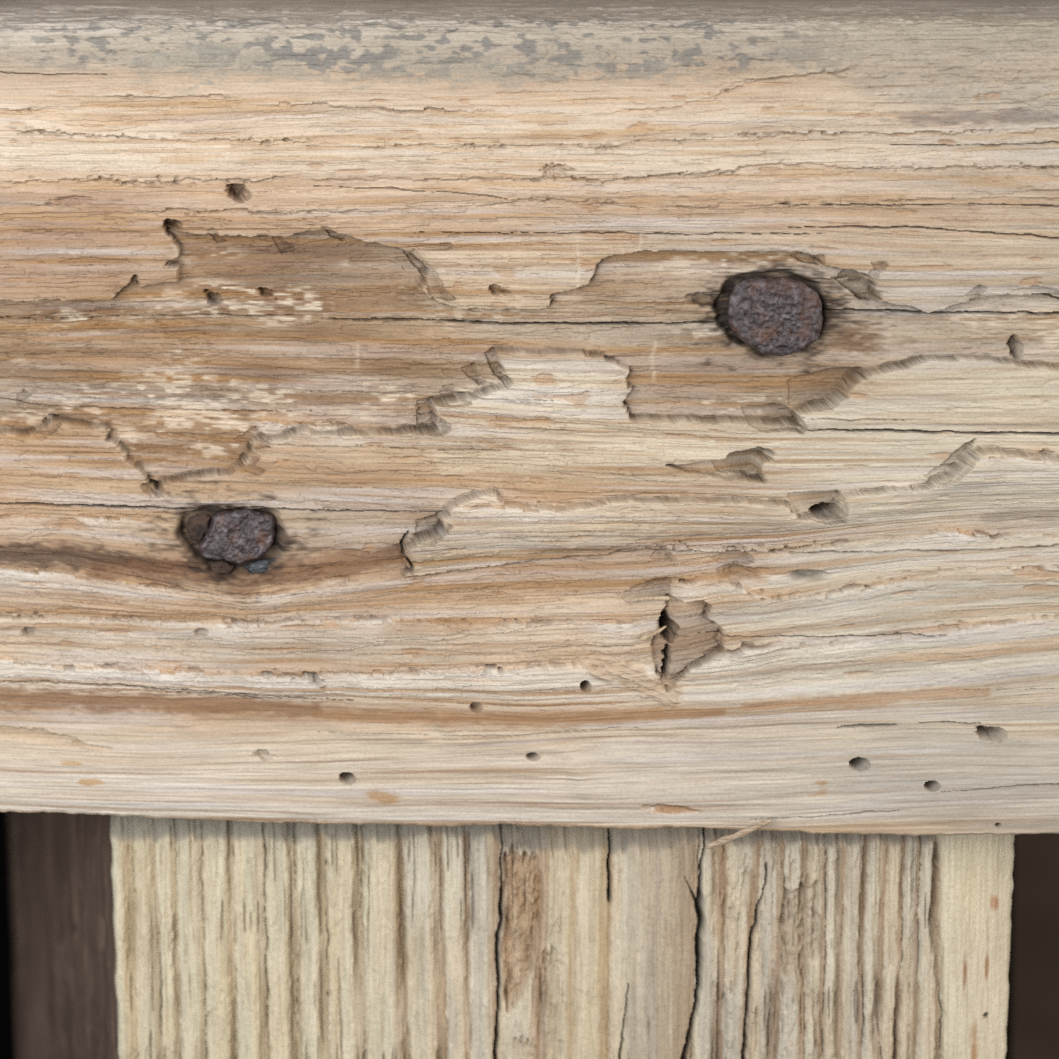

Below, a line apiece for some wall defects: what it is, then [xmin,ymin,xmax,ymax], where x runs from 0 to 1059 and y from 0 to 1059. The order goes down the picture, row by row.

crack [766,408,1059,436]
corrosion [103,475,341,615]
crack [492,824,505,1059]
crack [680,827,707,1059]